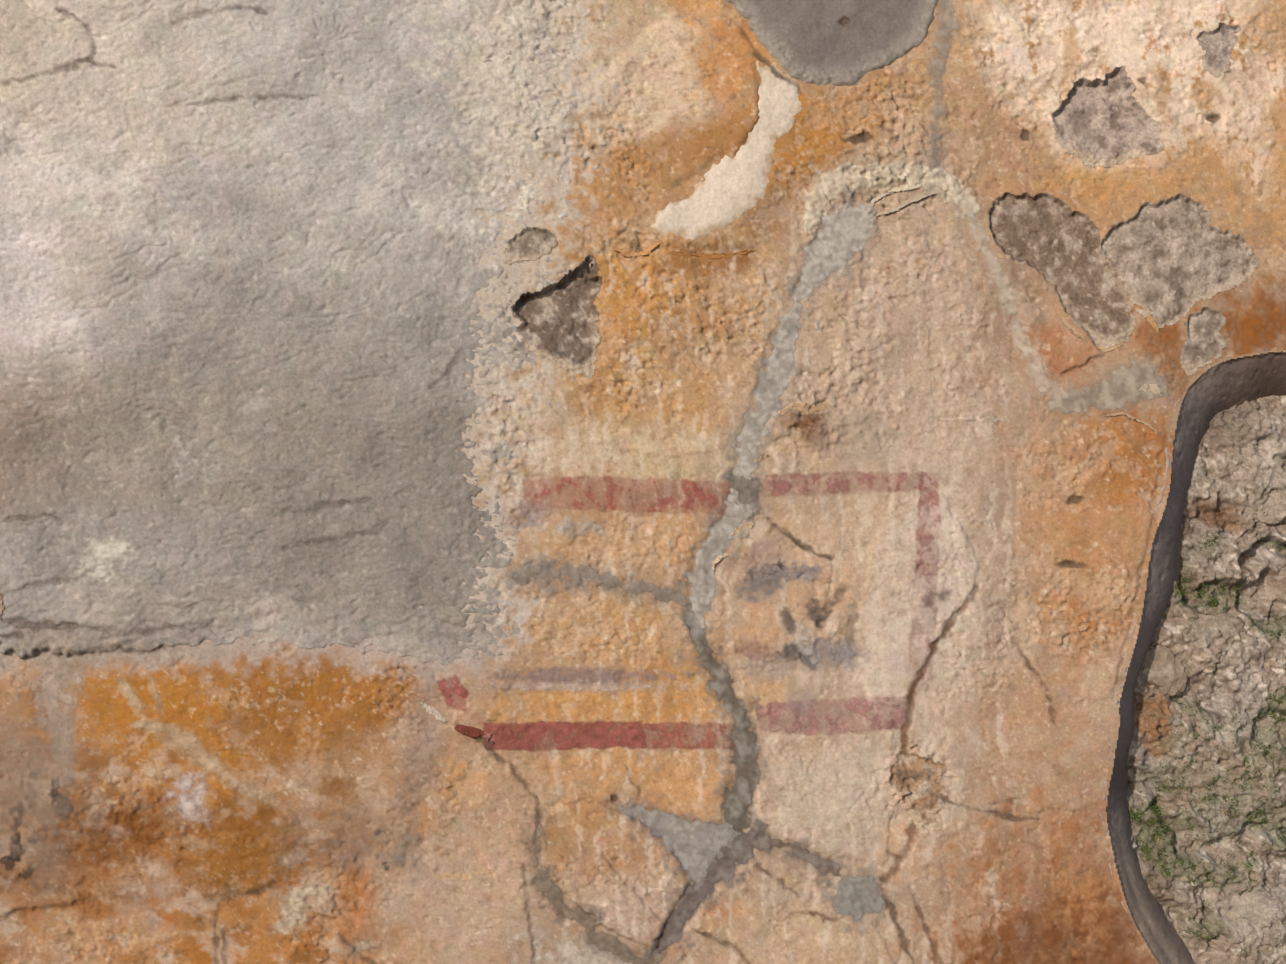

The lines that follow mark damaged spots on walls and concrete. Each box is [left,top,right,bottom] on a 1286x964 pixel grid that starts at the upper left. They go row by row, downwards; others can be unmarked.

spalling [1051,66,1164,167]
spalling [511,255,601,378]
crack [509,0,1168,964]
spalling [988,192,1286,964]
crack [477,738,515,774]